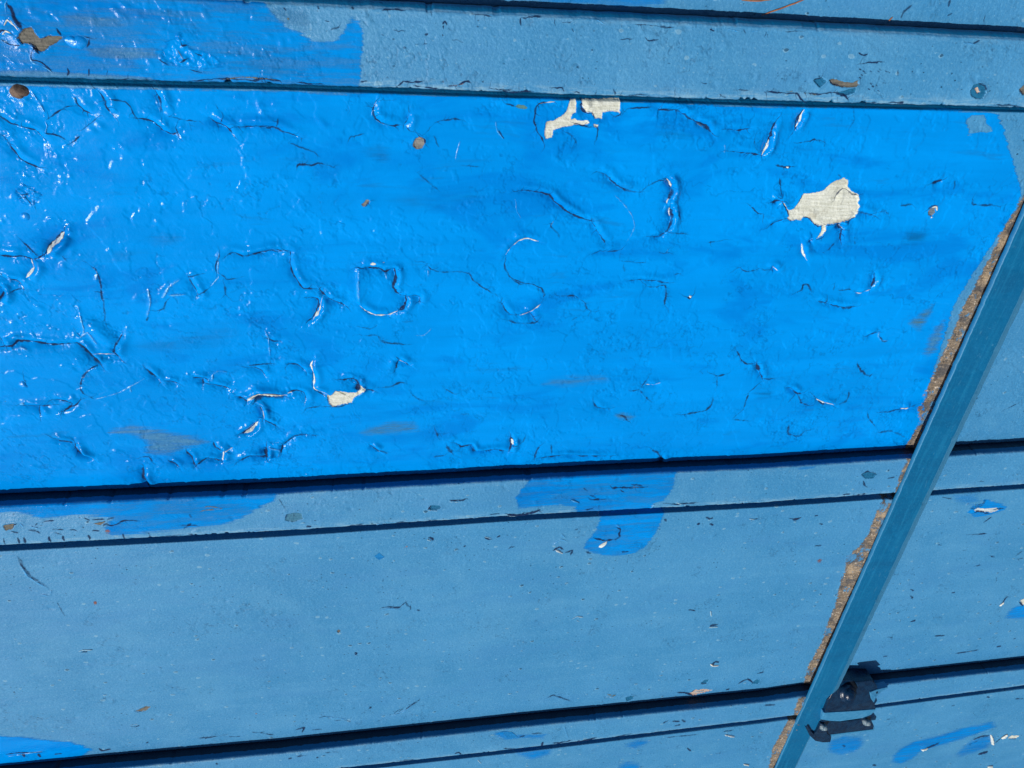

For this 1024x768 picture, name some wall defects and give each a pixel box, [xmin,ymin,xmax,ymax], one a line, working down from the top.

peeling [0,1,151,80]
crack [0,69,335,167]
crack [398,80,579,147]
peeling [544,97,621,139]
crack [613,53,903,157]
crack [0,225,67,307]
crack [190,249,349,323]
crack [421,178,685,324]
peeling [782,178,860,260]
crack [1,332,304,459]
peeling [239,361,374,408]
crack [142,403,315,485]